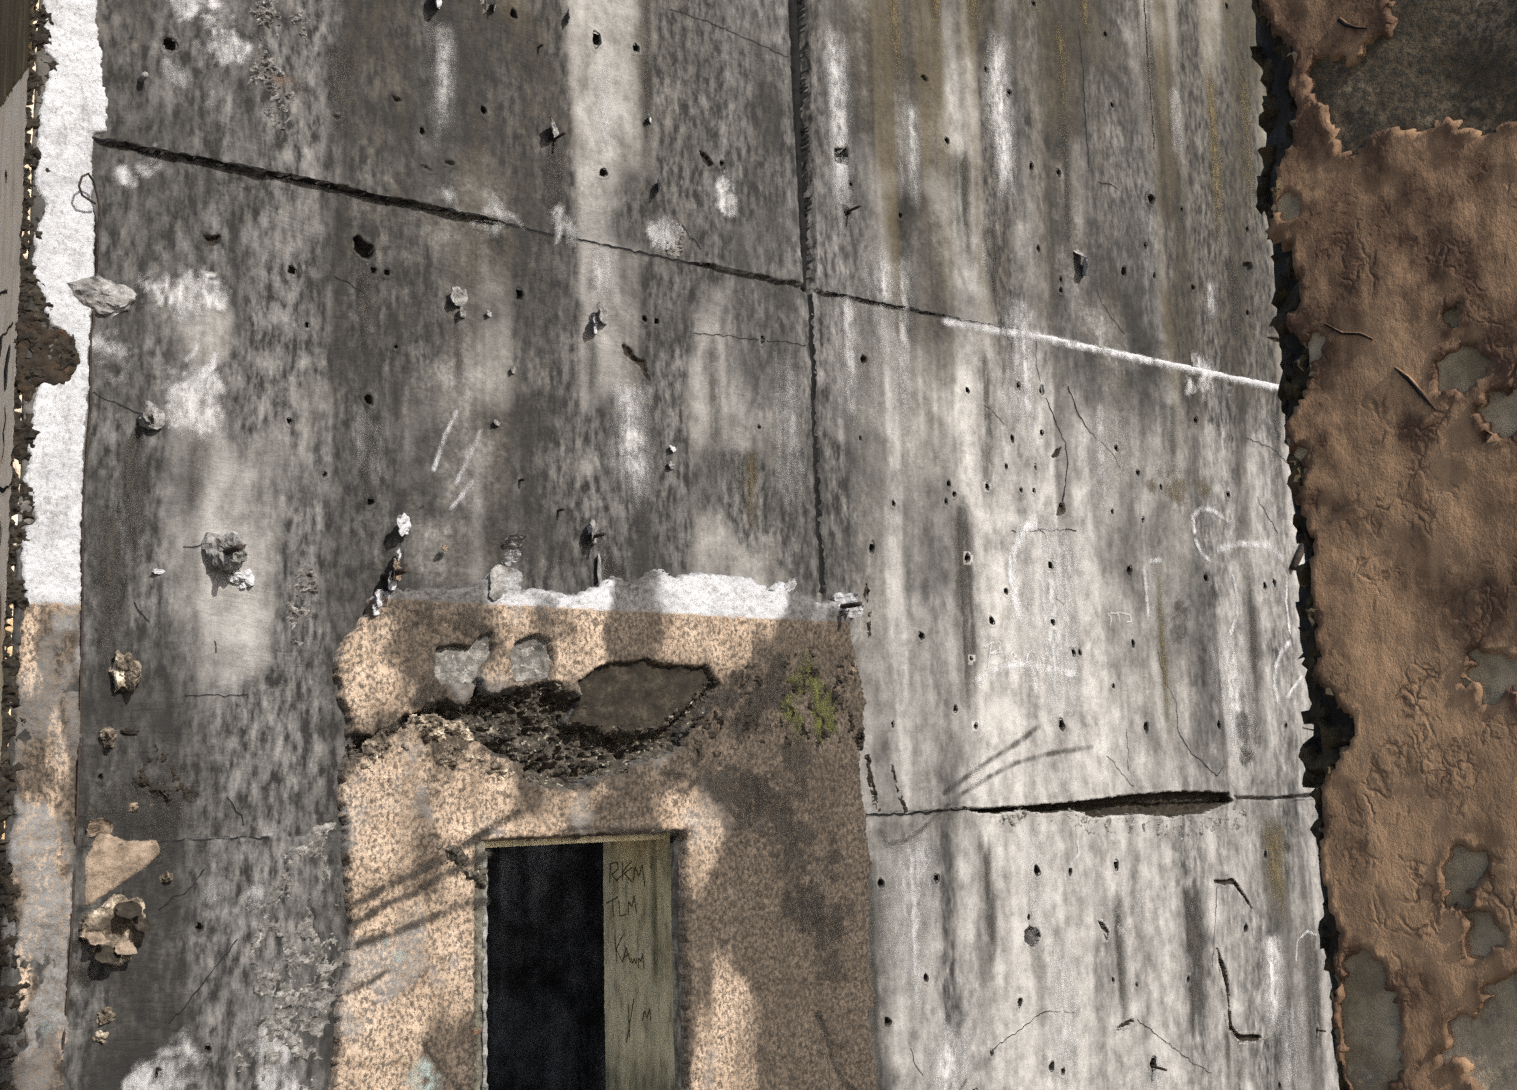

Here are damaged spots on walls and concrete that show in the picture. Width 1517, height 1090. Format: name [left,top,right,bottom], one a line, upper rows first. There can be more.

peeling [1250,0,1517,227]
spalling [1239,243,1326,416]
peeling [1436,346,1517,440]
spalling [0,0,80,1090]
peeling [80,543,92,564]
spalling [435,843,488,889]
spalling [343,634,881,812]
peeling [833,583,872,639]
spalling [890,764,908,813]
spalling [1284,438,1355,861]
peeling [1318,888,1404,1090]
peeling [1443,973,1517,1090]